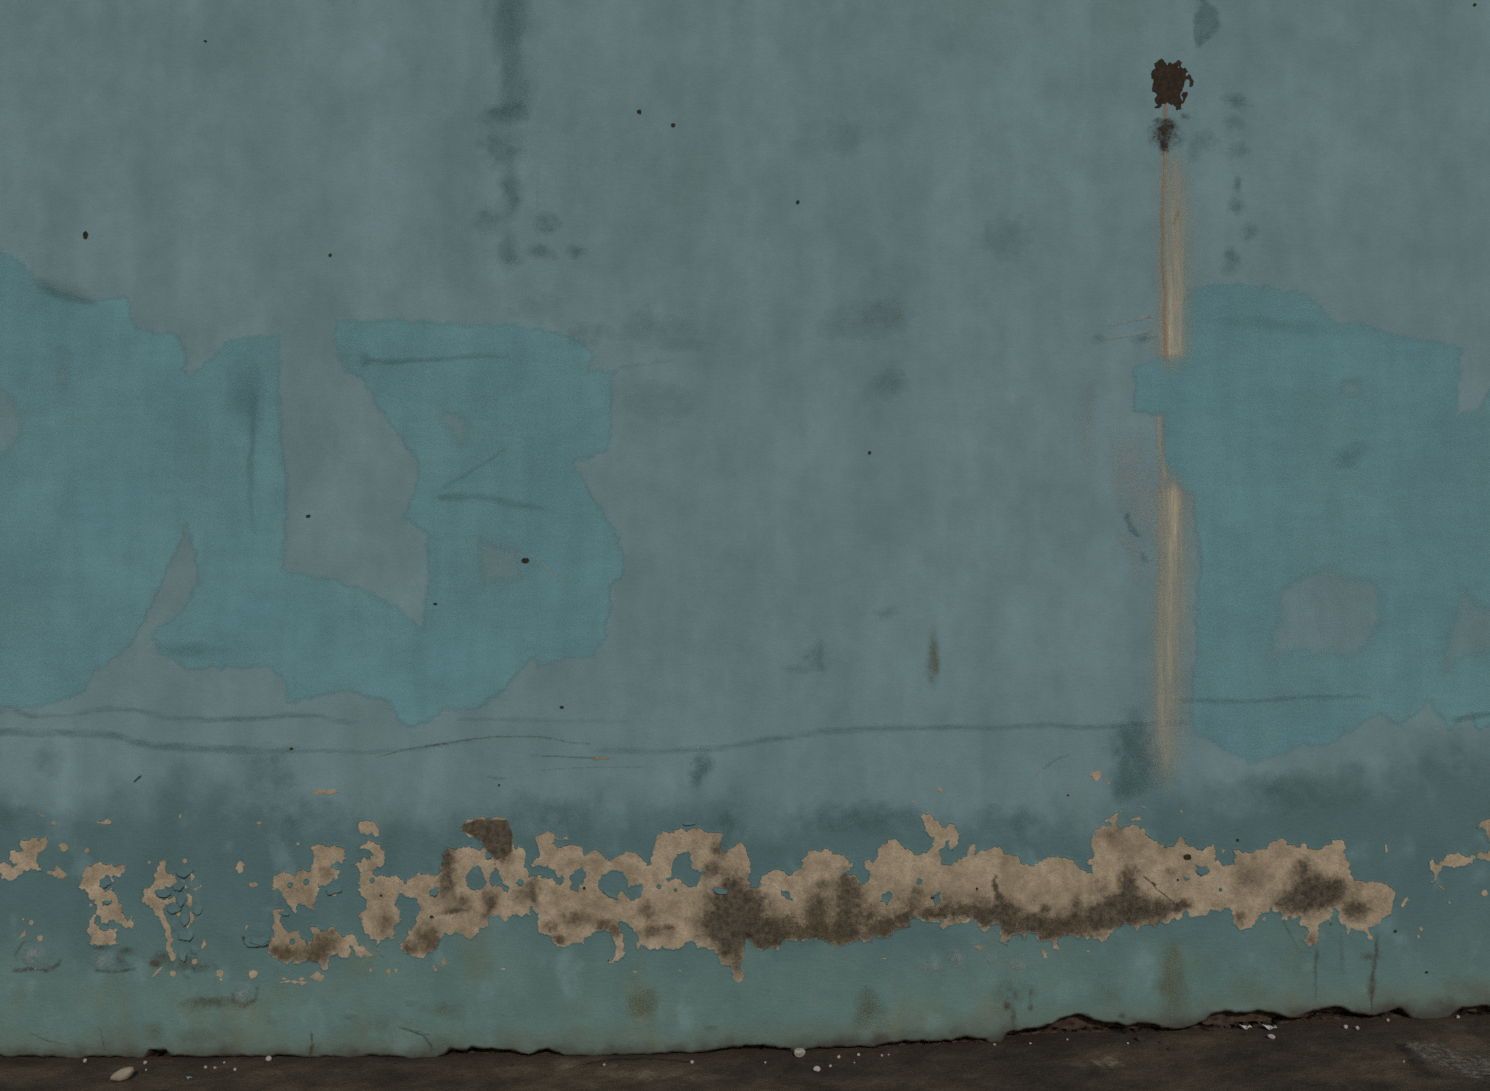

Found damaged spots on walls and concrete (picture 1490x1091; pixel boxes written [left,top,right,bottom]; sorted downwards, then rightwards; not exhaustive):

corrosion [1161,149,1183,358]
corrosion [1158,465,1182,727]
peeling [0,813,206,977]
peeling [236,801,1409,985]
peeling [1428,817,1490,904]